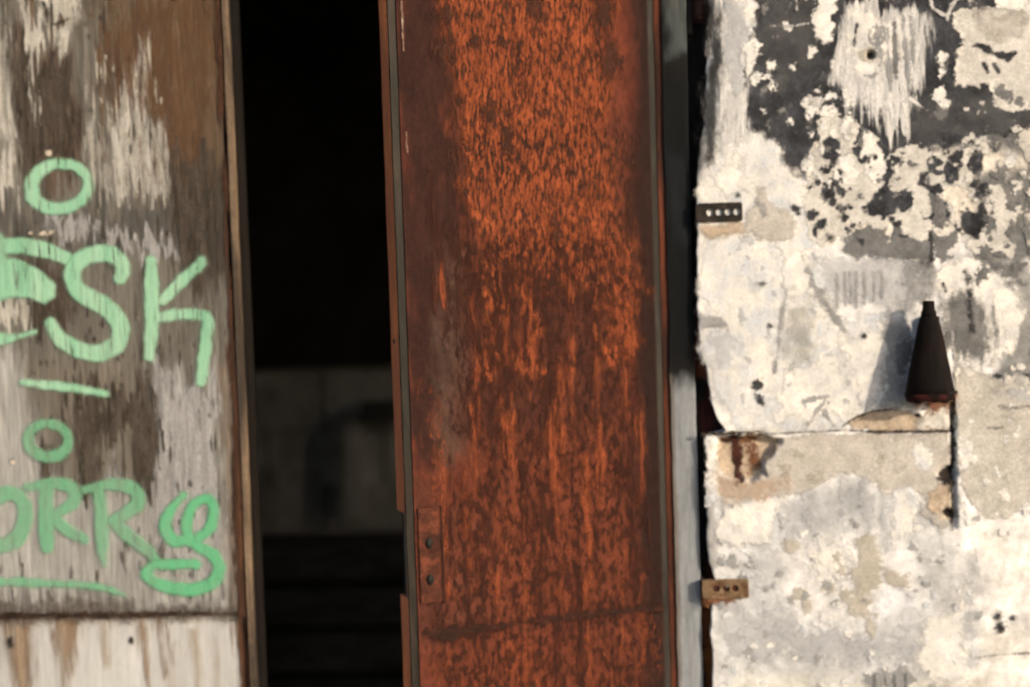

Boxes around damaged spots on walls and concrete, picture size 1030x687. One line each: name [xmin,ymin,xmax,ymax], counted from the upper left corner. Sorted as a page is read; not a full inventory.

peeling [0,0,220,346]
corrosion [427,0,658,687]
crack [701,402,957,531]
peeling [696,0,1030,664]
peeling [915,587,972,682]